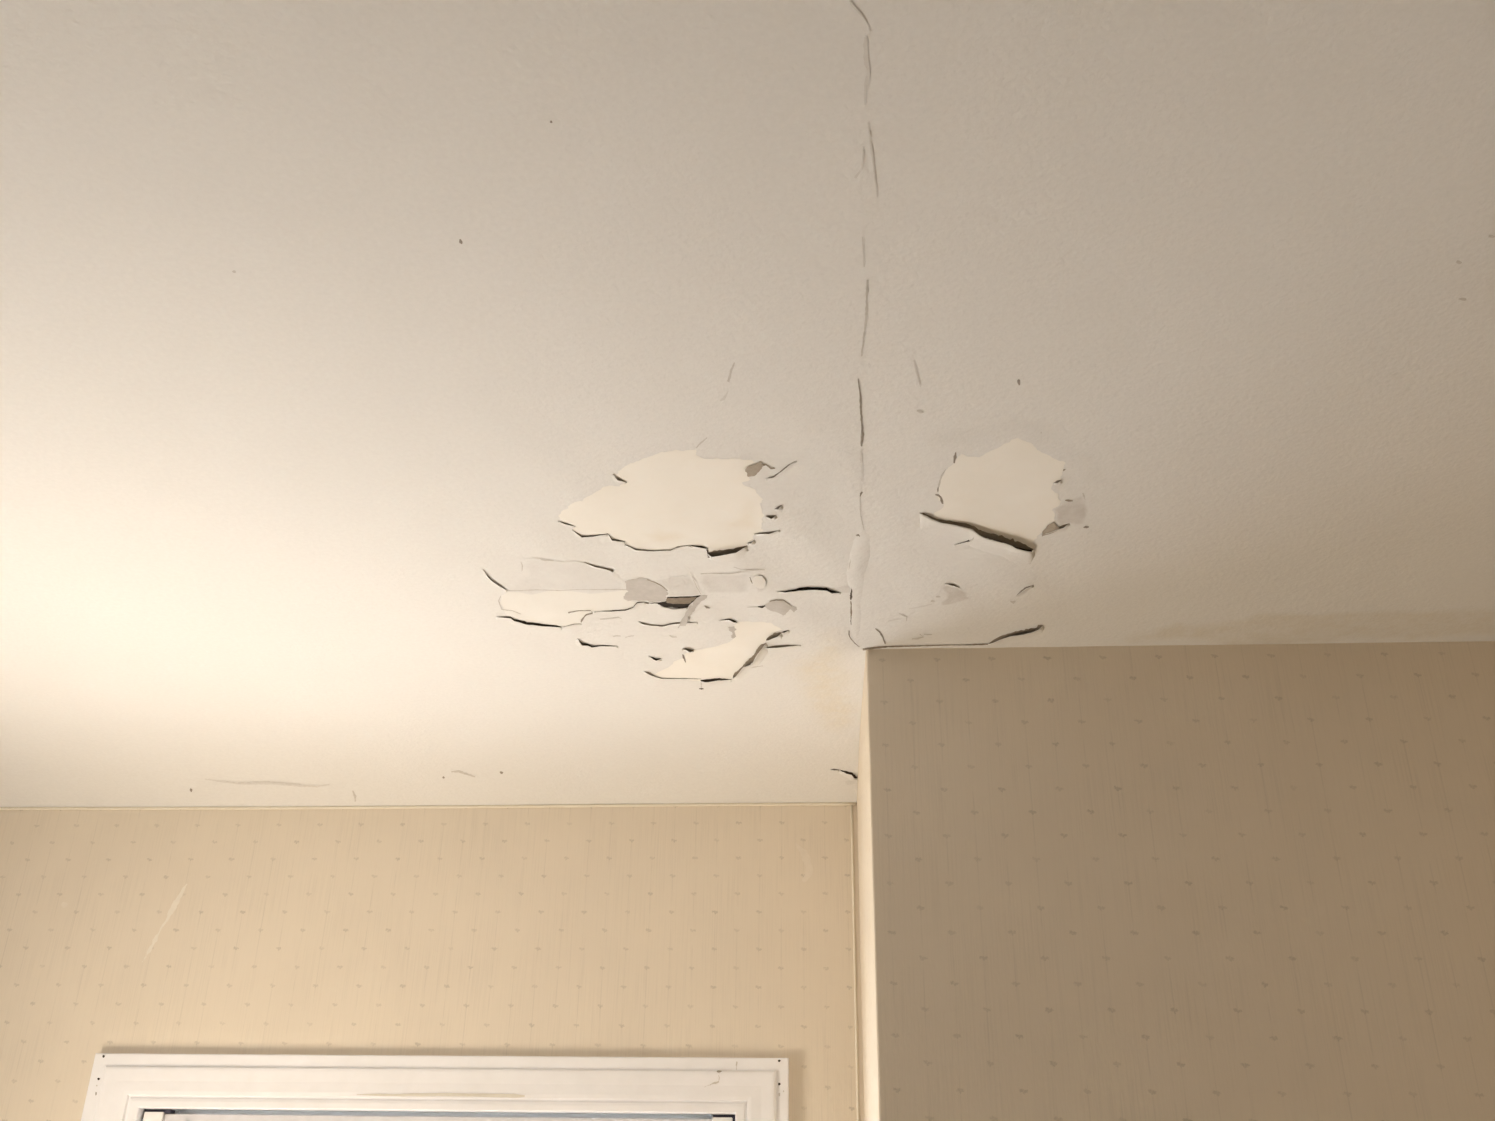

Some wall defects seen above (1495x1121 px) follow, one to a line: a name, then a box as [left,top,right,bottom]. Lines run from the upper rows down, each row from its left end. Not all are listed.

crack [849,0,878,197]
peeling [482,438,801,690]
crack [777,237,1044,650]
peeling [920,438,1089,564]